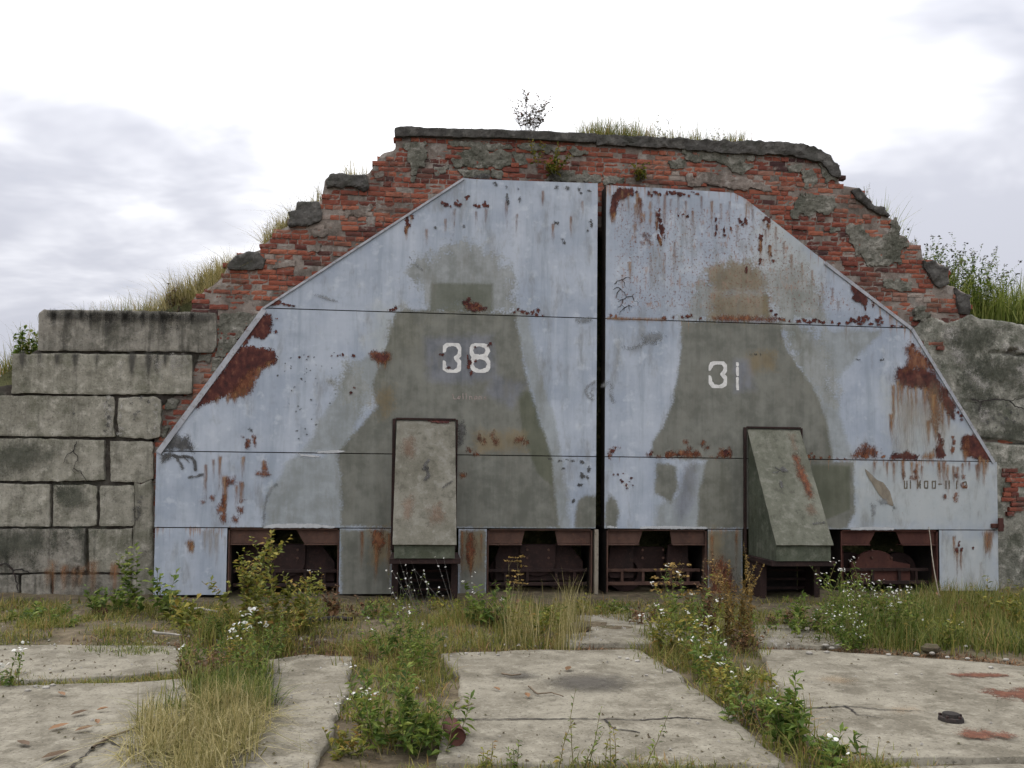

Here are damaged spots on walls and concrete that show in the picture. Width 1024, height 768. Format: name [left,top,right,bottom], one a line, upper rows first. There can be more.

peeling [440,195,490,208]
peeling [402,140,589,205]
rust [628,193,675,255]
peeling [545,149,772,221]
peeling [787,163,909,267]
peeling [769,285,931,327]
rust [844,341,990,502]
crack [64,441,87,481]
rust [202,457,244,523]
rust [792,452,831,497]
flaking render [1001,468,1024,516]
rust [953,532,992,568]